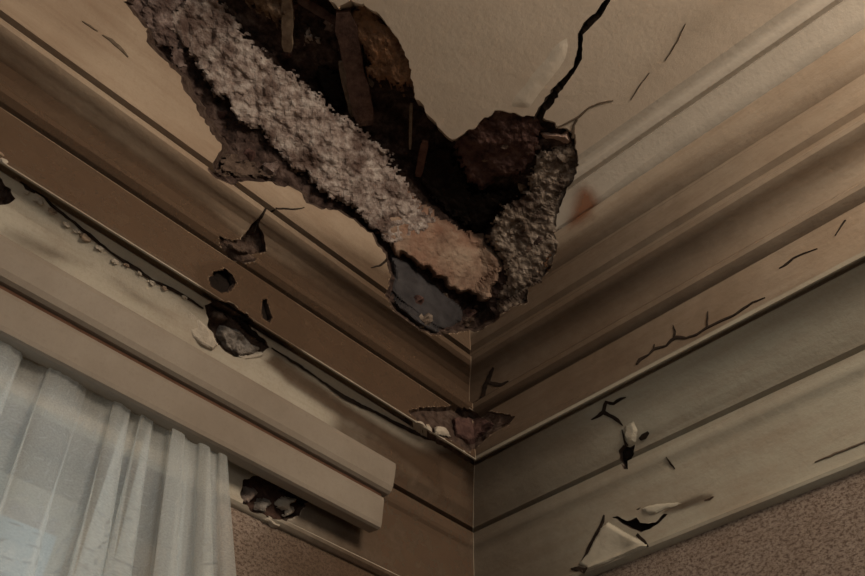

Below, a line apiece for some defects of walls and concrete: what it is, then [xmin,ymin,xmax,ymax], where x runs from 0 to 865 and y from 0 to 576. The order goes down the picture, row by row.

crack [533,0,686,138]
flaking render [0,183,12,205]
flaking render [130,0,578,336]
crack [20,181,203,309]
flaking render [188,270,268,359]
damp [0,56,621,576]
crack [636,297,765,365]
crack [271,348,435,442]
flaking render [403,410,514,462]
crack [591,397,649,447]
flaking render [240,476,308,528]
flaking render [579,502,681,570]